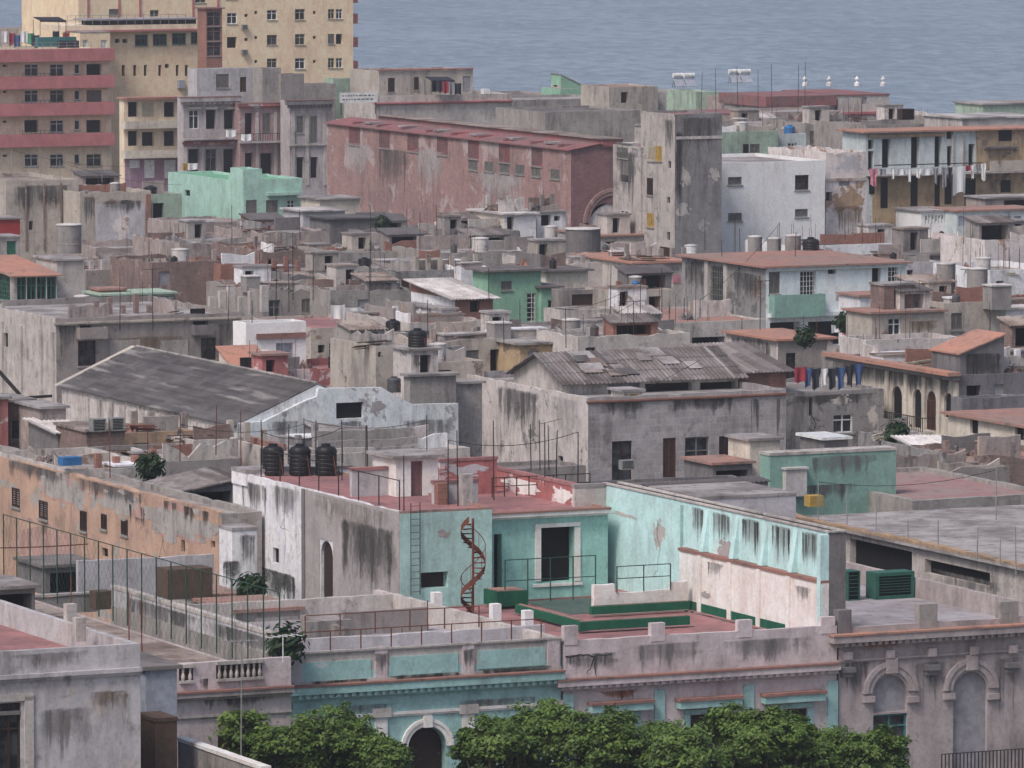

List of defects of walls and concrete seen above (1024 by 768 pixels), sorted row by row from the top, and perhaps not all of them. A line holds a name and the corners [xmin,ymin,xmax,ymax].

flaking render [35,470,219,544]
damp [342,521,394,578]
peeling [500,478,572,504]
peeling [653,518,665,550]
damp [695,509,729,533]
damp [742,519,758,549]
damp [772,526,815,559]
crack [565,654,611,674]